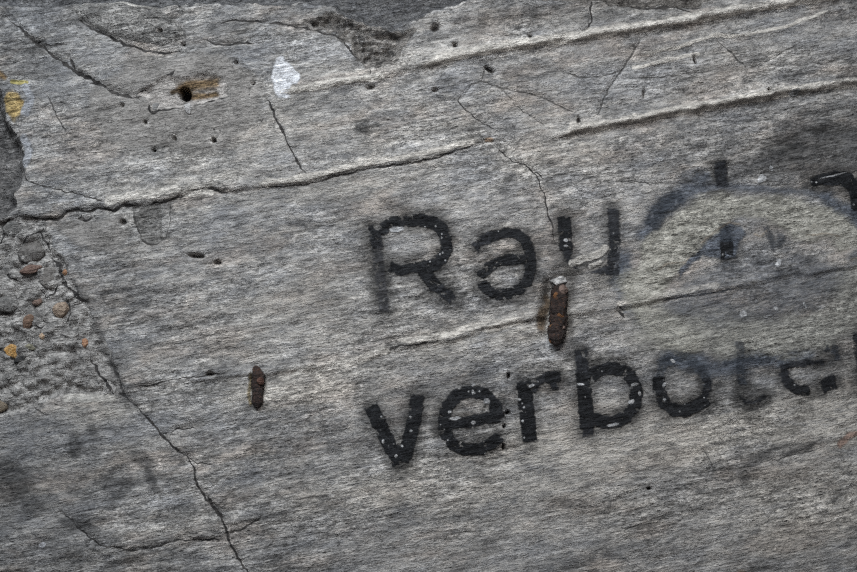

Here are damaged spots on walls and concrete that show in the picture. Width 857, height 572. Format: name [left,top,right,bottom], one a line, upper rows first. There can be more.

crack [6,16,150,99]
crack [76,13,179,54]
crack [207,19,371,73]
crack [626,5,704,17]
corrosion [170,78,218,100]
crack [13,38,795,243]
corrosion [537,285,568,331]
crack [62,362,261,572]